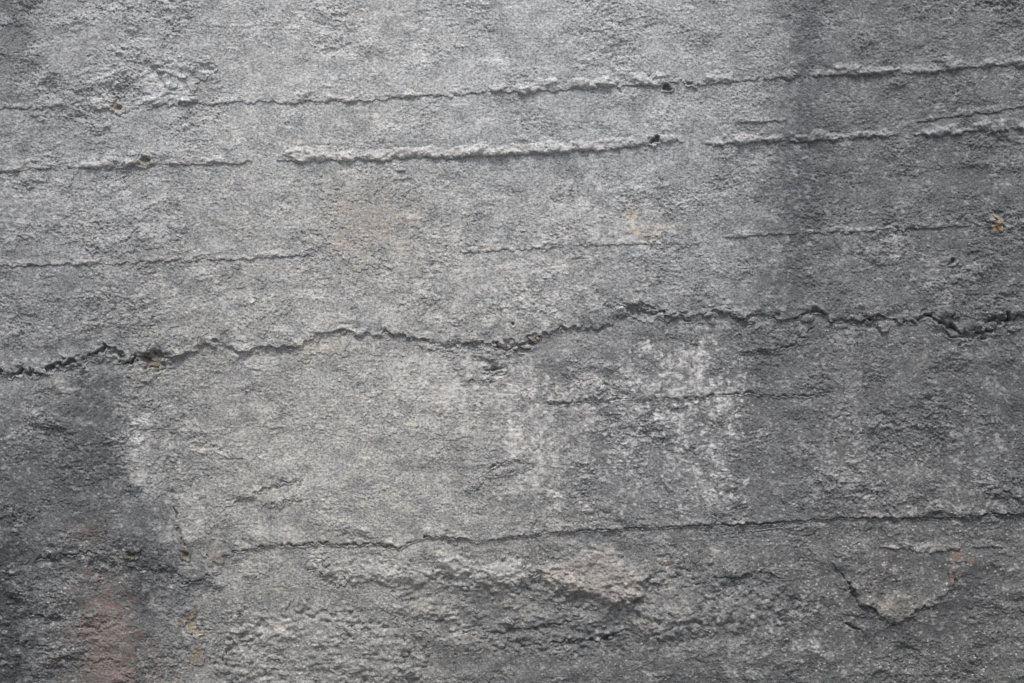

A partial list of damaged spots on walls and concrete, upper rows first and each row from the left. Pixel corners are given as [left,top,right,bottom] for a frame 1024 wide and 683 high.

crack [0,298,1024,382]
damp [0,153,294,683]
crack [168,500,187,548]
crack [180,511,1024,587]